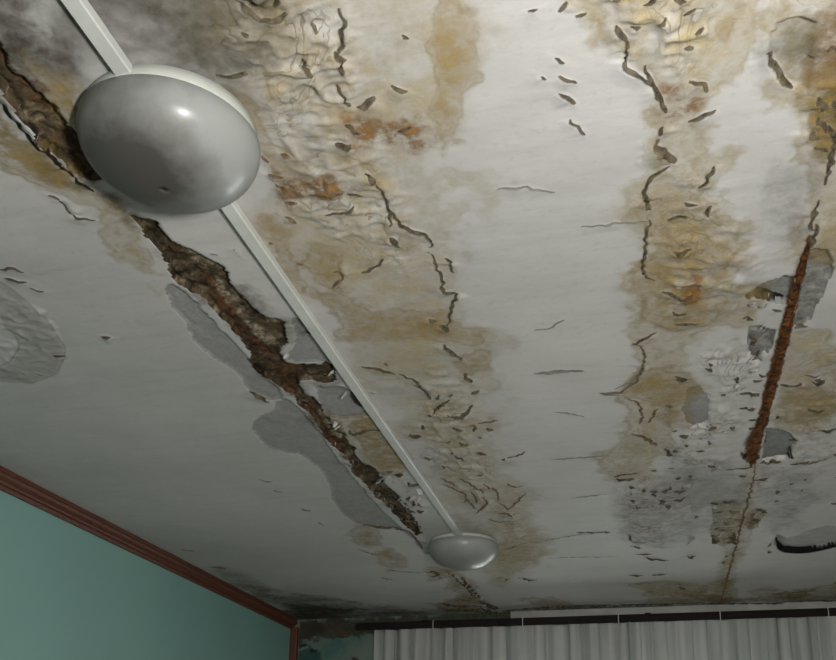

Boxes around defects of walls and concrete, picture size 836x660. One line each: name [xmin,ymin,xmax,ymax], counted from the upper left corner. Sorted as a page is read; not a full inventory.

leakage [89,0,223,74]
leakage [280,176,338,200]
crack [334,8,408,152]
leakage [334,107,423,149]
crack [541,58,586,135]
crack [615,0,716,326]
spalling [768,16,817,92]
crack [325,173,462,361]
spalling [746,248,834,325]
spalling [130,215,429,554]
rust [743,235,812,467]
peeling [614,386,717,510]